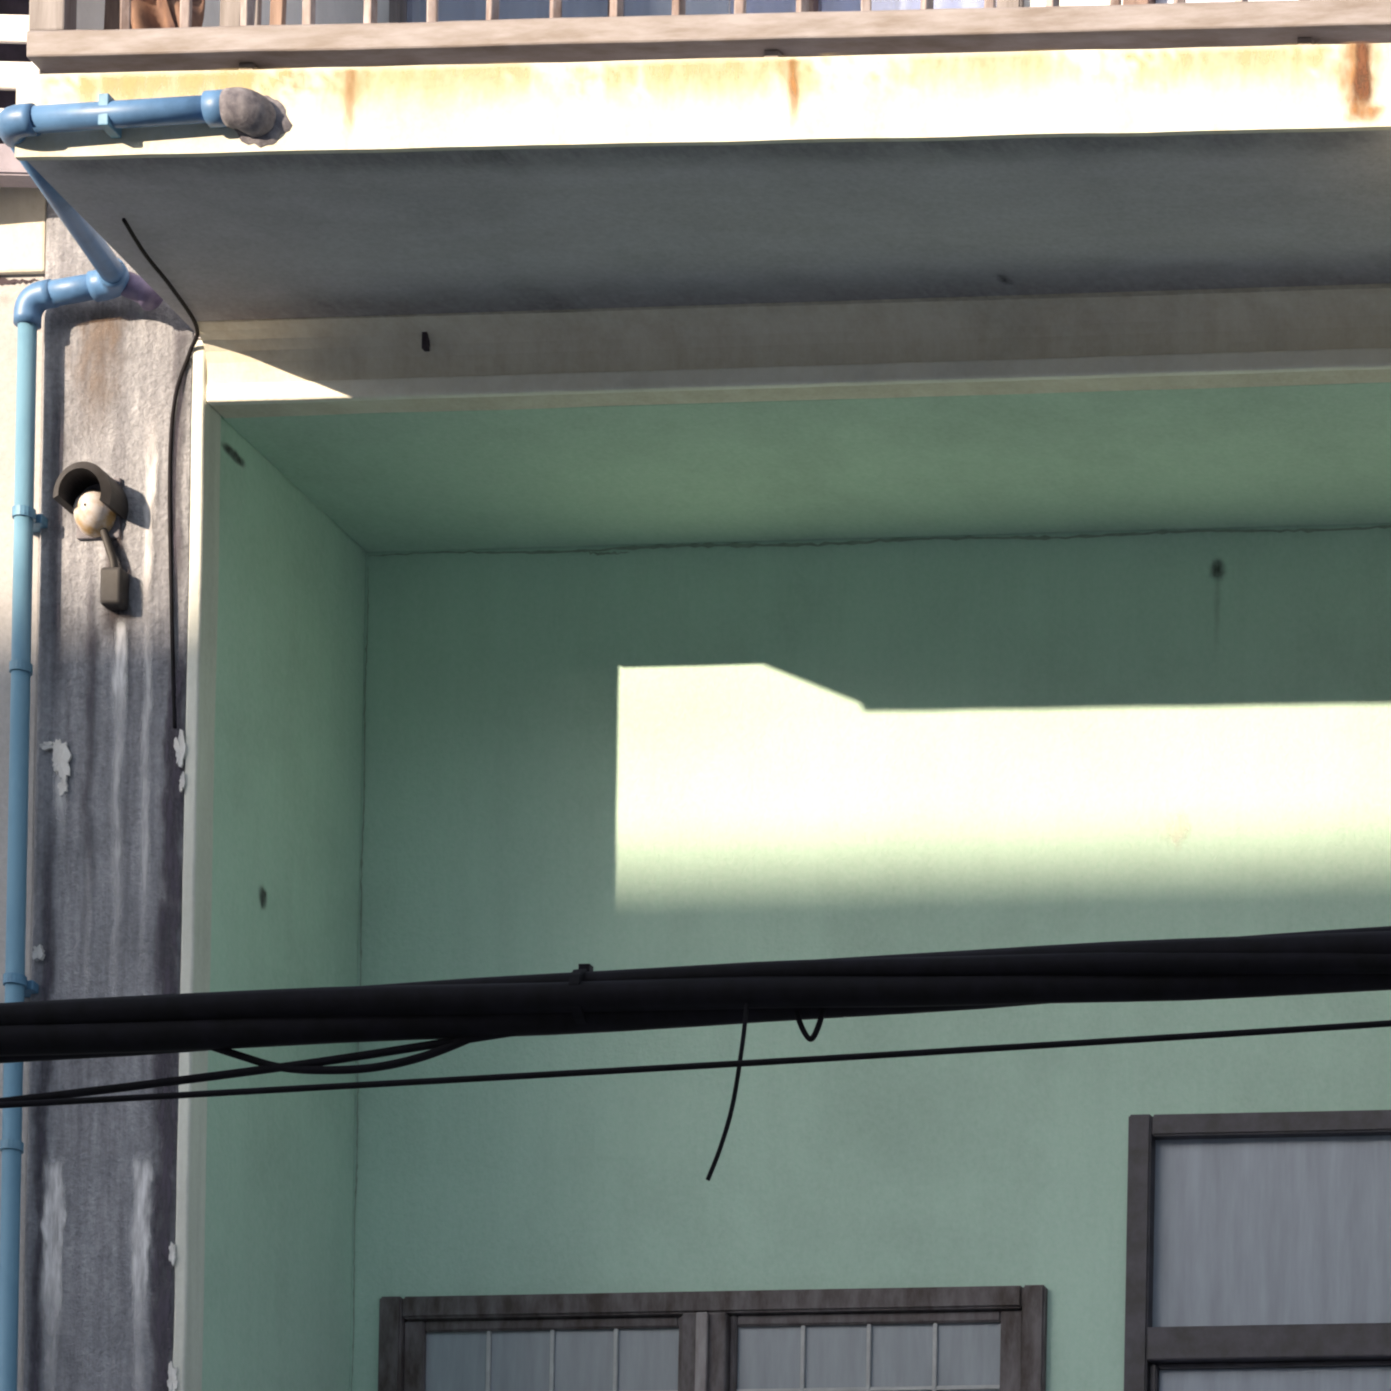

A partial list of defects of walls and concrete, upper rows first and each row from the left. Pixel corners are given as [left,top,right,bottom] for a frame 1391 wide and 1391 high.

rust [789,61,797,102]
rust [1346,43,1376,116]
damp [106,456,180,580]
damp [104,608,130,709]
peeling [39,739,72,806]
damp [145,657,184,994]
peeling [174,729,187,792]
damp [41,864,52,1001]
damp [29,1061,66,1391]
damp [132,1053,177,1391]